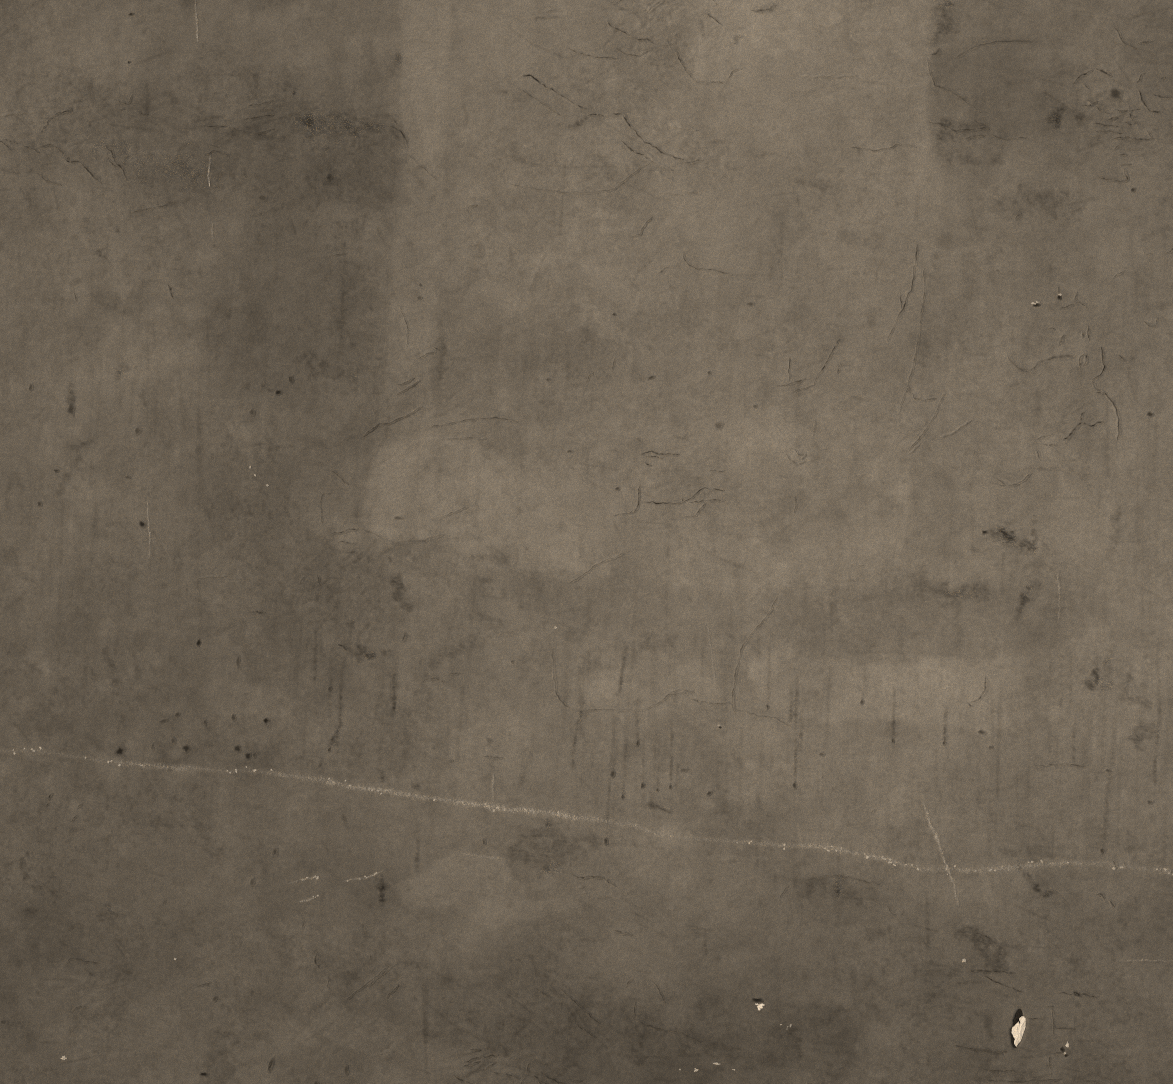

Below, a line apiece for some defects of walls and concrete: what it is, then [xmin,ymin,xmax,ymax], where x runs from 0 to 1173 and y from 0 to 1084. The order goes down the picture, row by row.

spalling [1011,1009,1026,1048]